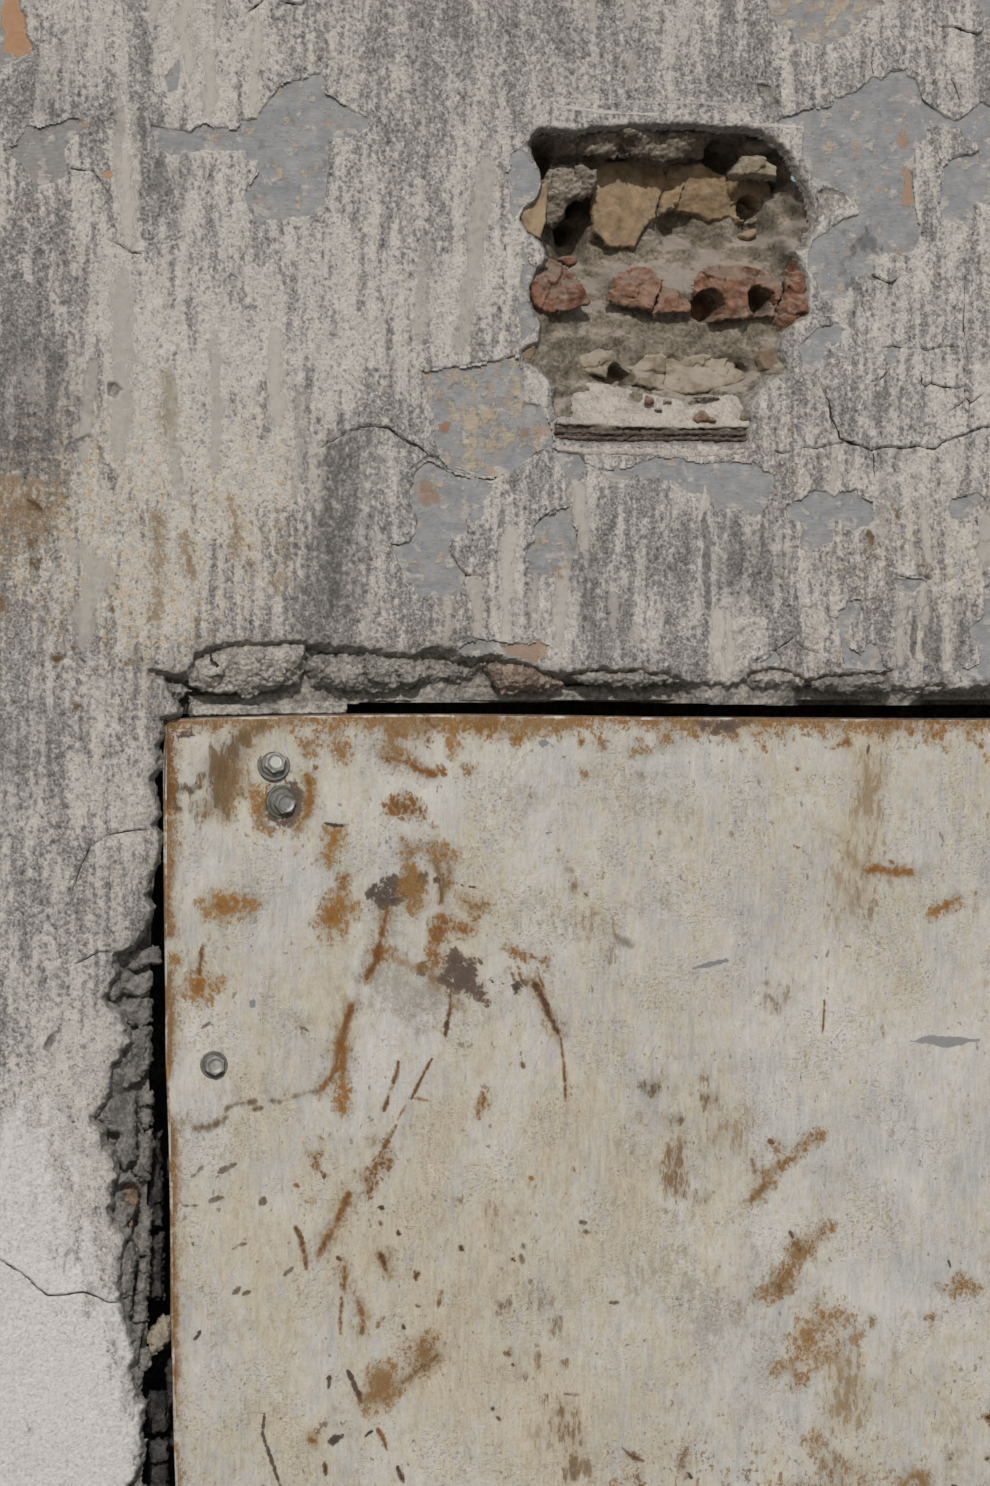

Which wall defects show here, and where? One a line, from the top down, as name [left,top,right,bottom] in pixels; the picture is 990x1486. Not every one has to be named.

peeling [151,68,368,222]
crack [328,425,497,481]
spalling [392,70,990,598]
crack [775,282,990,476]
spalling [166,587,990,717]
corrosion [167,717,990,1098]
corrosion [315,1004,354,1117]
spalling [95,923,171,1486]
corrosion [660,1116,689,1213]
crack [6,1263,116,1303]
corrosion [748,1219,876,1485]
corrosion [545,1394,591,1483]